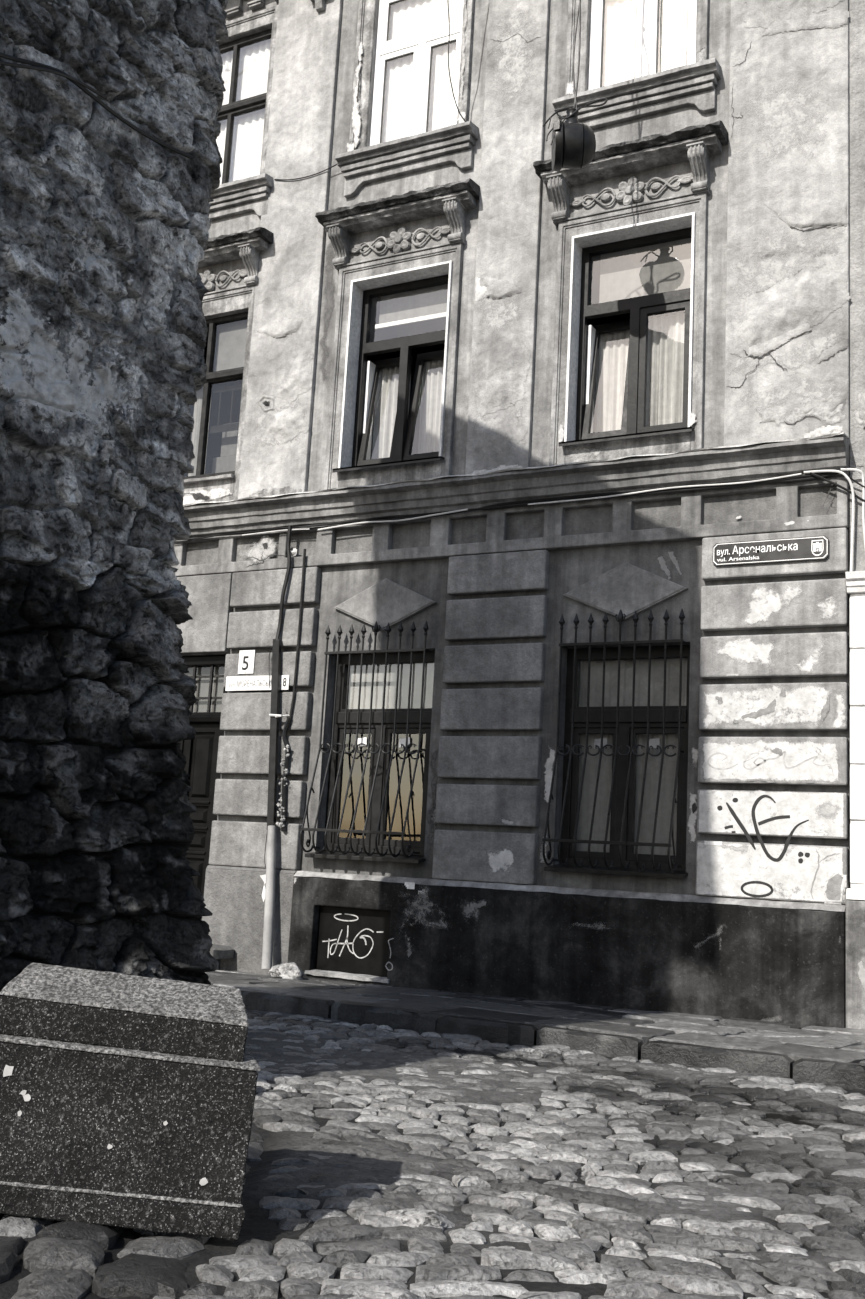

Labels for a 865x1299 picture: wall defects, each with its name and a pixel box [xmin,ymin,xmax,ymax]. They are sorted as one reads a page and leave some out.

peeling [487,848,514,873]
peeling [688,585,846,904]